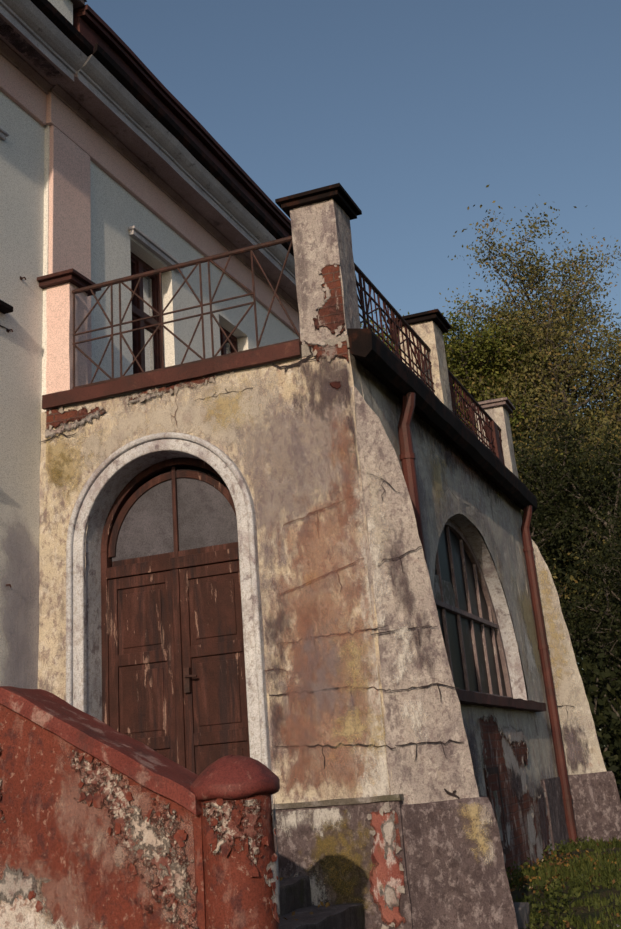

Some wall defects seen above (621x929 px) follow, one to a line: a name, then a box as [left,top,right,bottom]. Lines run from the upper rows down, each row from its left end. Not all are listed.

flaking render [307,259,349,362]
crack [283,496,354,526]
crack [339,546,422,592]
crack [348,625,437,645]
crack [264,669,457,702]
flaking render [0,864,64,929]
peeling [66,750,198,929]
peeling [202,796,280,924]
damp [282,808,375,908]
crack [274,739,463,769]
peeling [367,802,405,929]
flaking render [478,713,553,875]